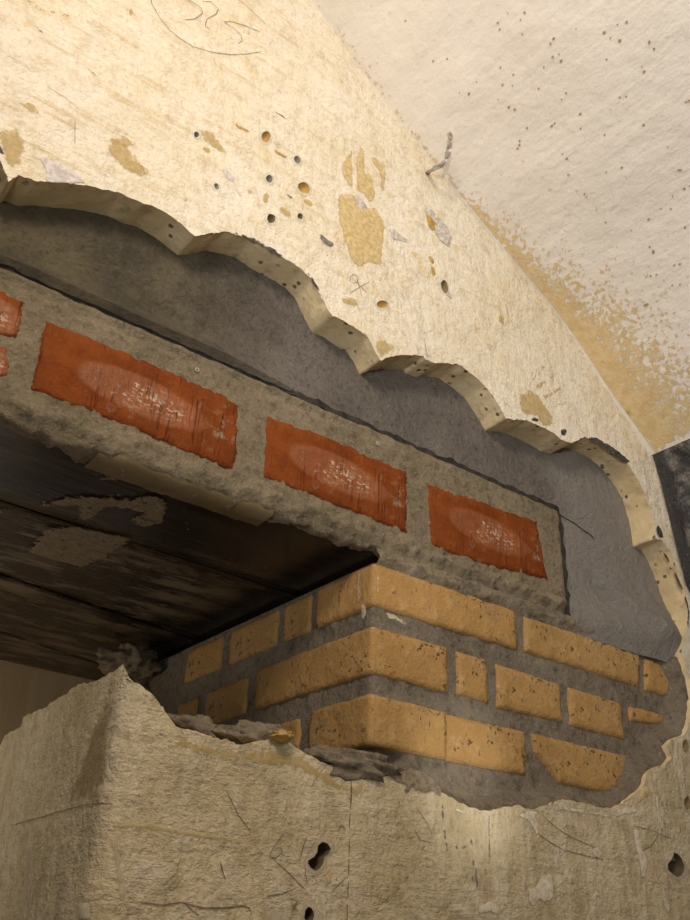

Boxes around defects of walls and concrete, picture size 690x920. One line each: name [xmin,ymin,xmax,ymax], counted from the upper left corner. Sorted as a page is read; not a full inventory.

spalling [236,124,287,157]
peeling [41,156,84,183]
peeling [338,148,407,266]
peeling [395,109,690,453]
leakage [520,366,566,425]
crack [137,893,283,916]
flaking render [529,874,554,905]